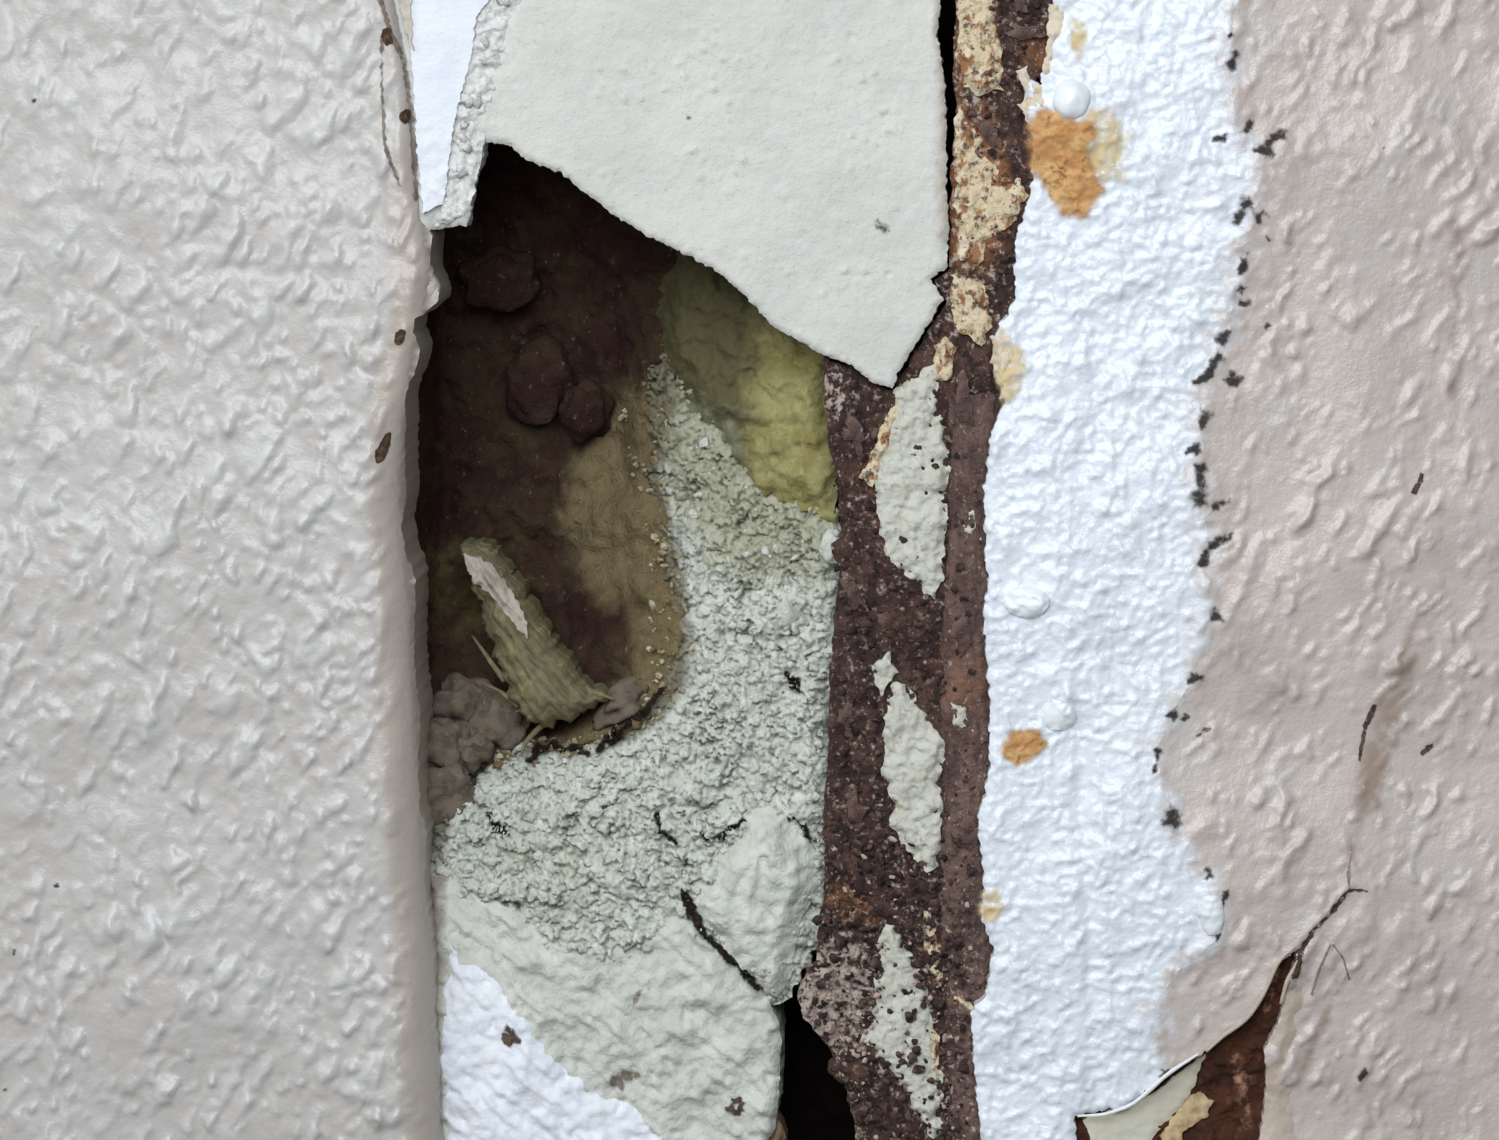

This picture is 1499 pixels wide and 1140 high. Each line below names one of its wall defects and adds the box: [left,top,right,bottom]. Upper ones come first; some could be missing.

peeling [1016,4,1065,119]
peeling [399,109,411,124]
corrosion [1026,109,1122,218]
corrosion [998,330,1025,402]
peeling [375,432,391,463]
corrosion [843,407,865,457]
spalling [414,142,842,1005]
corrosion [1002,730,1047,766]
corrosion [956,810,979,850]
corrosion [980,891,1000,921]
flaking render [501,1026,521,1047]
flaking render [725,1097,745,1116]